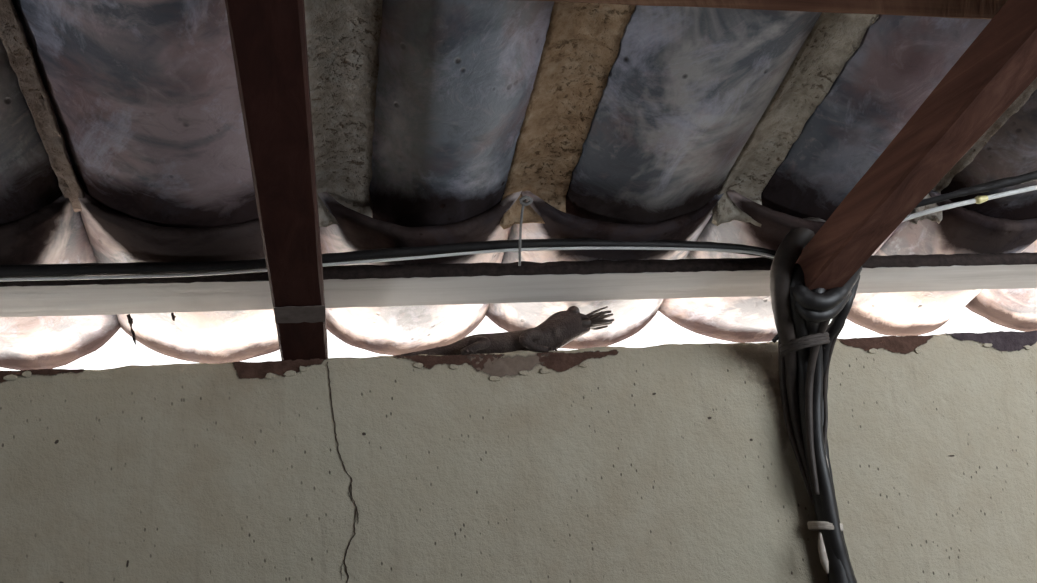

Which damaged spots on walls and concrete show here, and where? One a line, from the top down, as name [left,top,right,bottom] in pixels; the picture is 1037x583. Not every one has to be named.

spalling [233,358,324,379]
peeling [393,350,618,381]
crack [326,362,359,583]